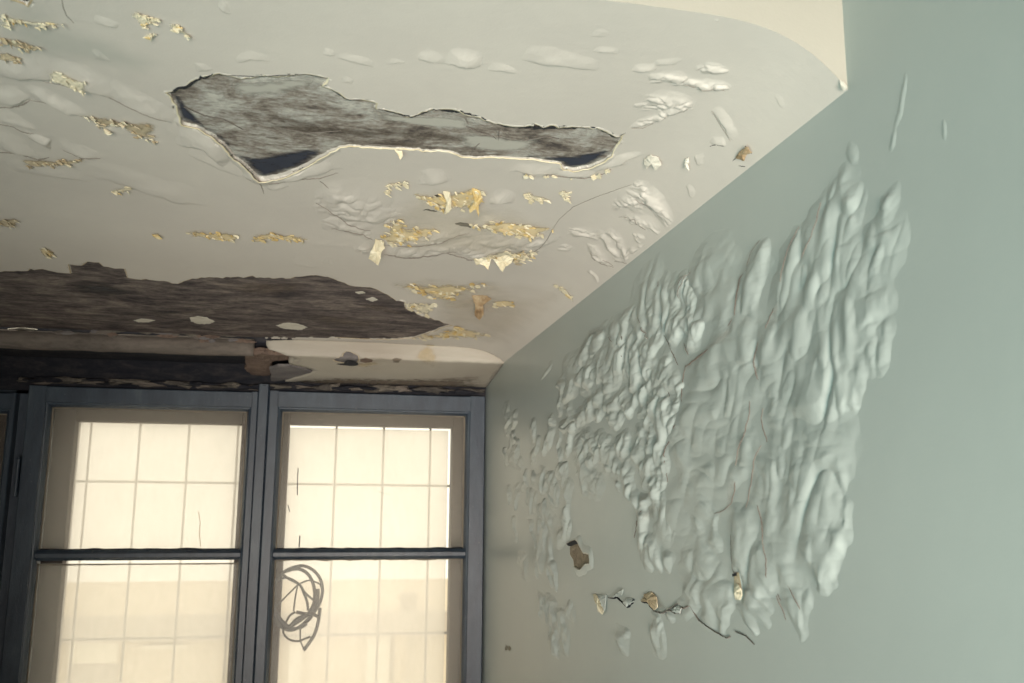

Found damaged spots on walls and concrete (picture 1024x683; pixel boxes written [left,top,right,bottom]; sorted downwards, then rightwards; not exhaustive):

peeling [0,14,64,65]
peeling [133,13,191,41]
peeling [84,116,158,145]
peeling [164,72,626,204]
peeling [368,219,440,265]
peeling [384,181,554,272]
peeling [0,248,515,396]
peeling [734,583,742,600]